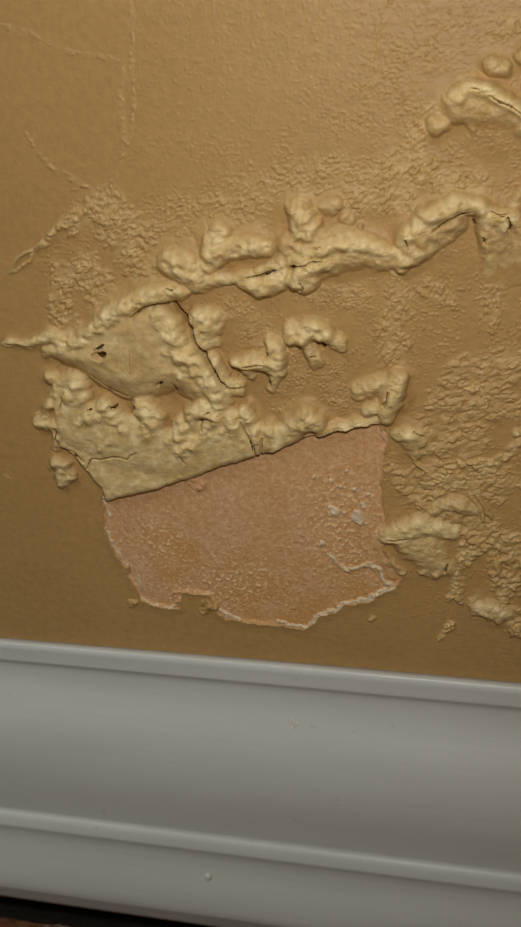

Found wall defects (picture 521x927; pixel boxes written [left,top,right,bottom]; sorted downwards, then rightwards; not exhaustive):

flaking render [33,368,482,629]